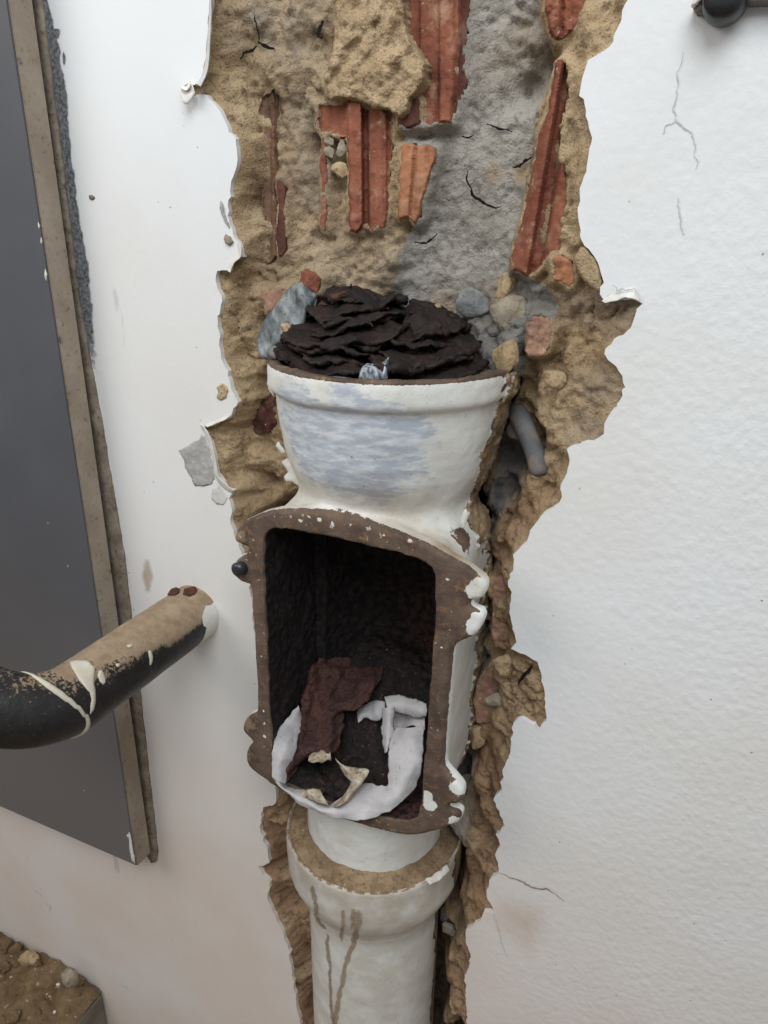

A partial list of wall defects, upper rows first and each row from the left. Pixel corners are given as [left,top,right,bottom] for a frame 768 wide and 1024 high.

crack [663,51,699,168]
spalling [179,0,642,1024]
spalling [167,586,197,596]
crack [500,873,561,899]